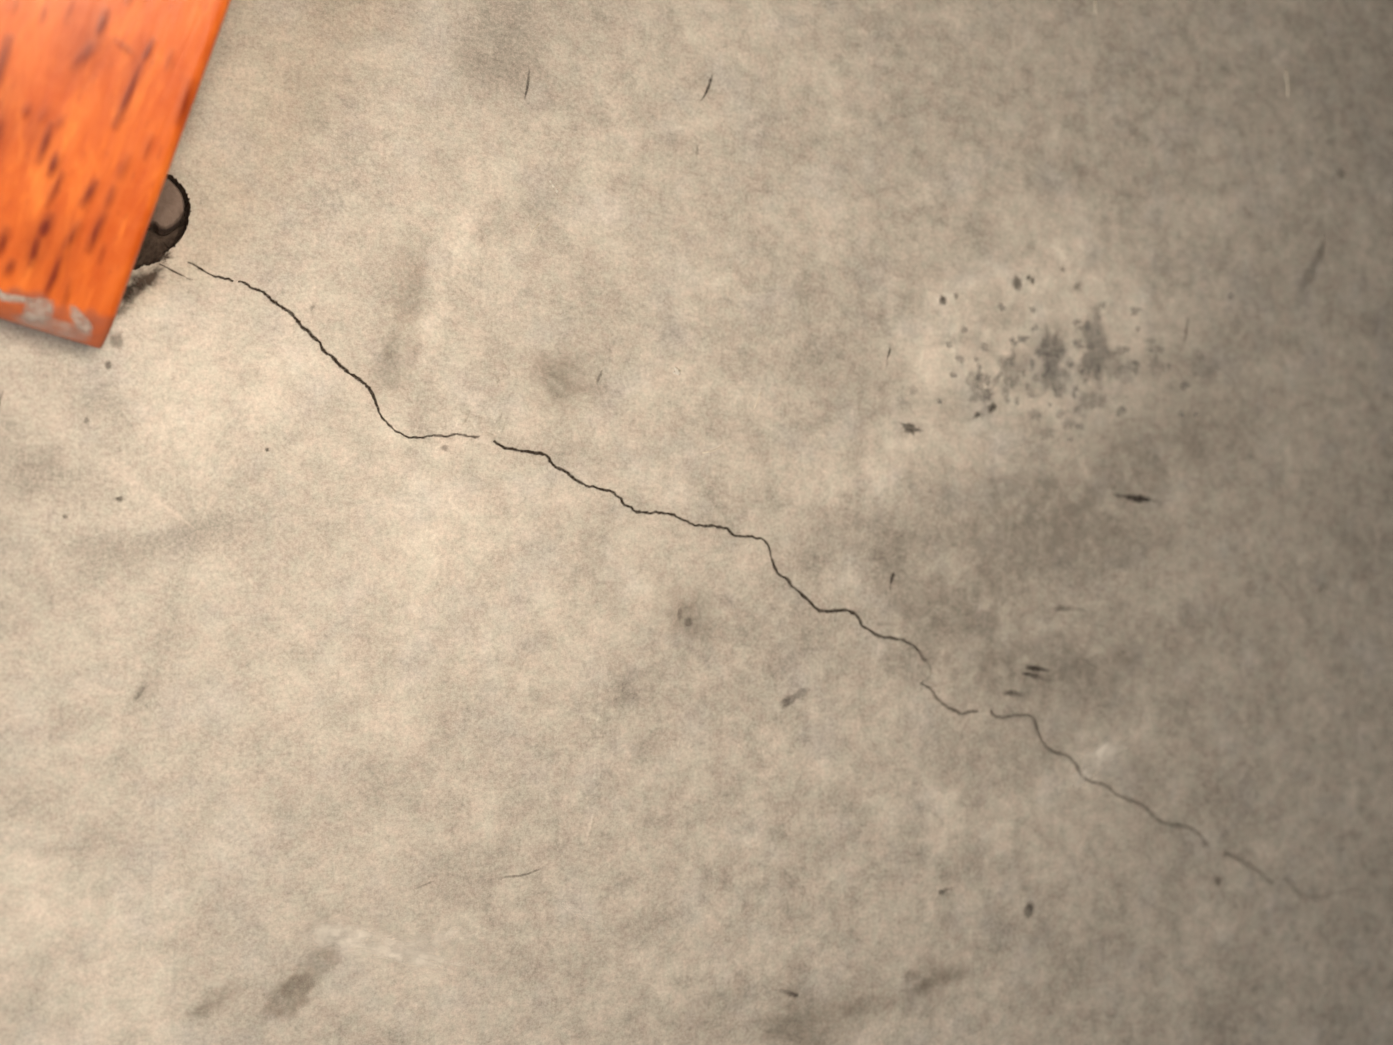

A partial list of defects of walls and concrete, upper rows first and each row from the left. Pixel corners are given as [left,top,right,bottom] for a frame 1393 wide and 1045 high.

crack [159,262,918,651]